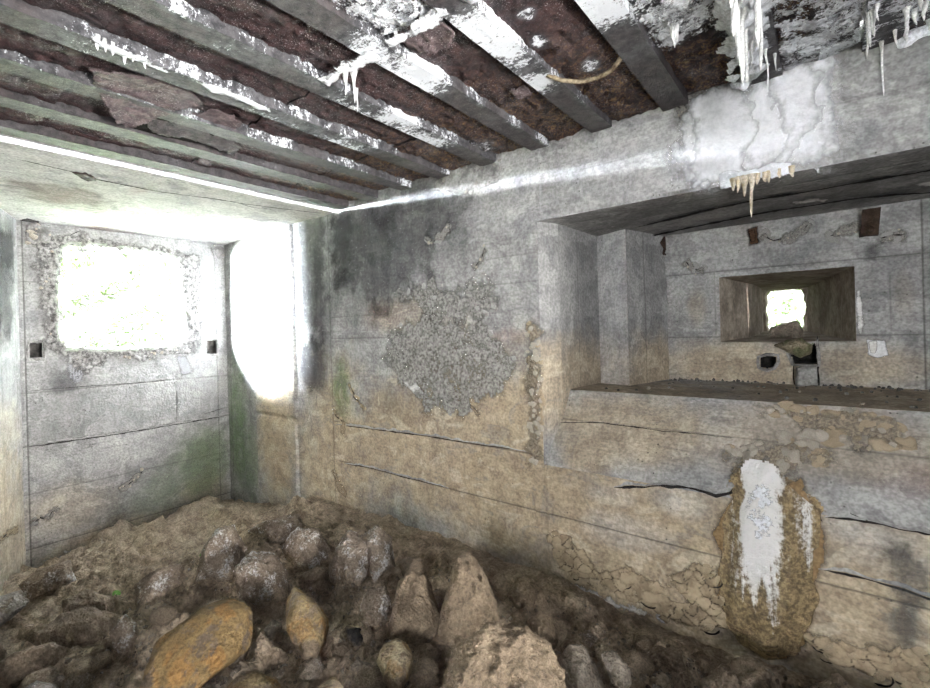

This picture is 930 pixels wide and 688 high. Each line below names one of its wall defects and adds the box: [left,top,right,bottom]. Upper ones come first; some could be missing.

leakage [332,0,448,47]
corrosion [392,15,455,55]
leakage [318,51,381,111]
corrosion [509,85,532,100]
leakage [672,0,930,188]
crack [614,479,734,498]
leakage [712,459,826,660]
crack [818,567,930,601]